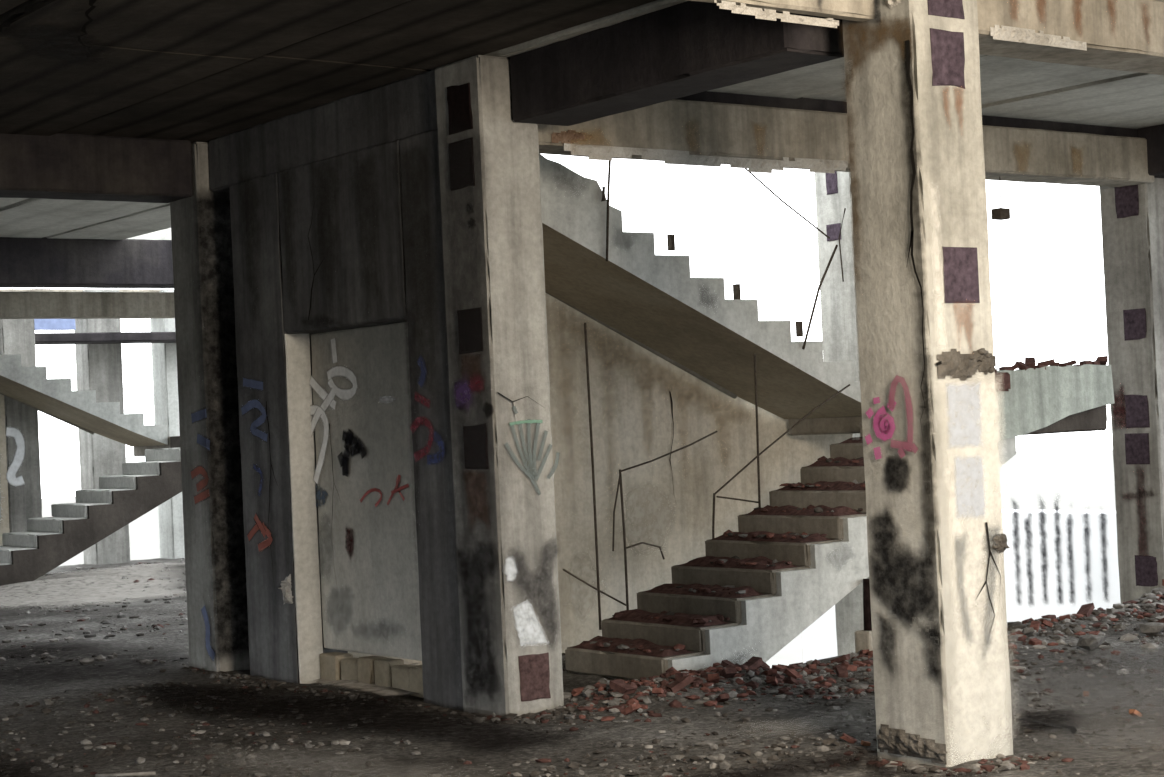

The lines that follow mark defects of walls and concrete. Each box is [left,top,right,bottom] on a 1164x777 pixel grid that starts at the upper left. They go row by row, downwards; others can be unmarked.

crack [905,40,982,436]
peeling [937,348,1010,751]